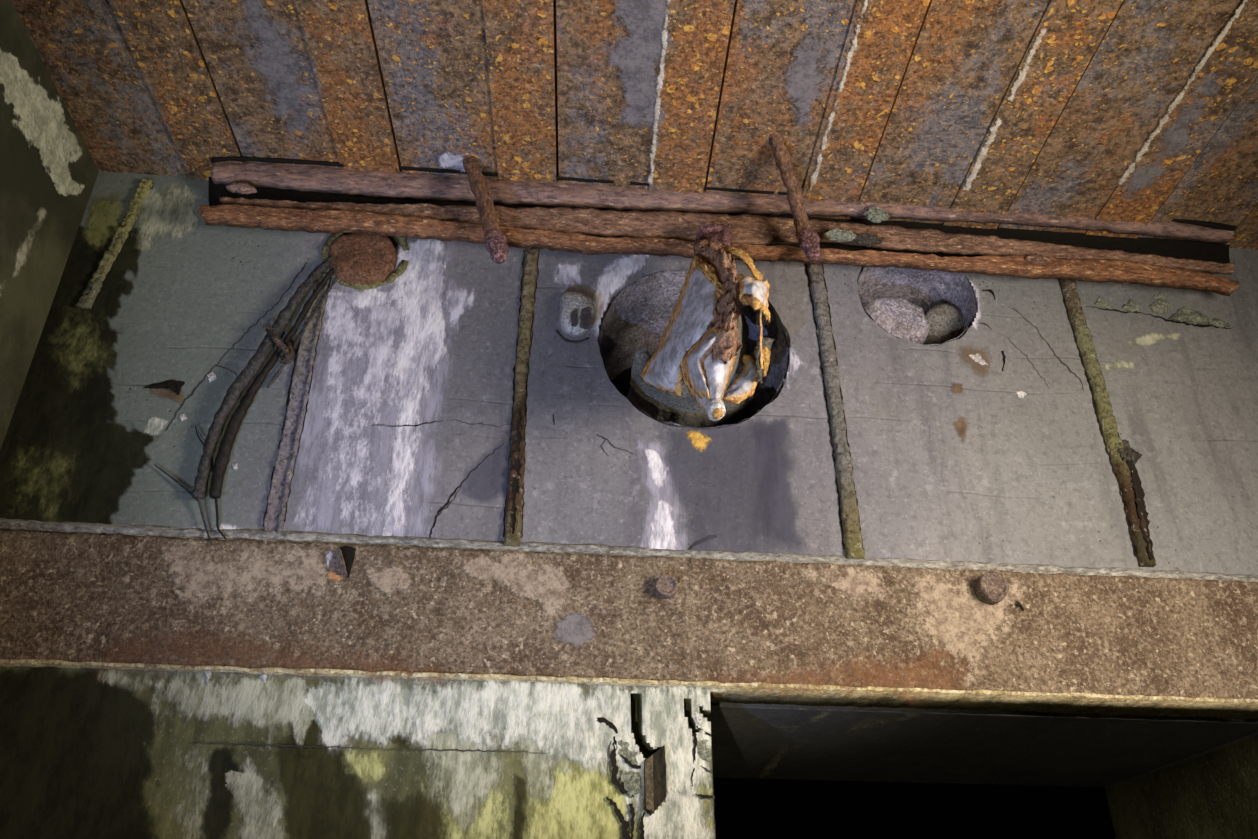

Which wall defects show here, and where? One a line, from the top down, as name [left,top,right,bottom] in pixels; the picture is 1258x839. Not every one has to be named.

peeling [0,48,84,196]
leakage [295,239,474,536]
crack [374,420,510,538]
rust [326,552,343,581]
leakage [0,667,725,839]
spalling [618,739,641,798]
spalling [691,711,711,763]